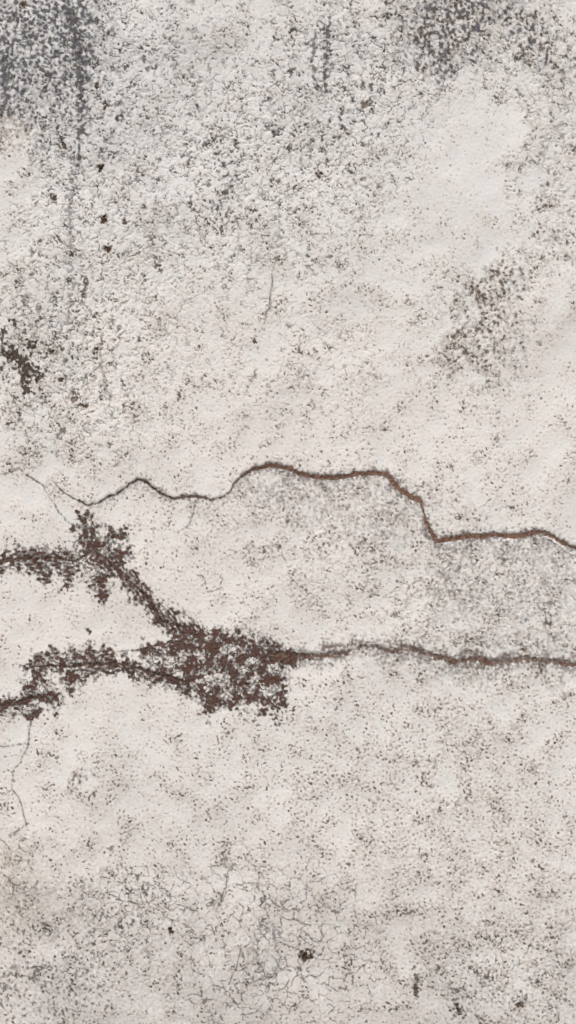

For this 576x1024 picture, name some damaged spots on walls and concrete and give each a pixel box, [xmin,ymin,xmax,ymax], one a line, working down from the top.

crack [2,462,576,555]
corrosion [0,506,315,726]
crack [270,640,576,678]